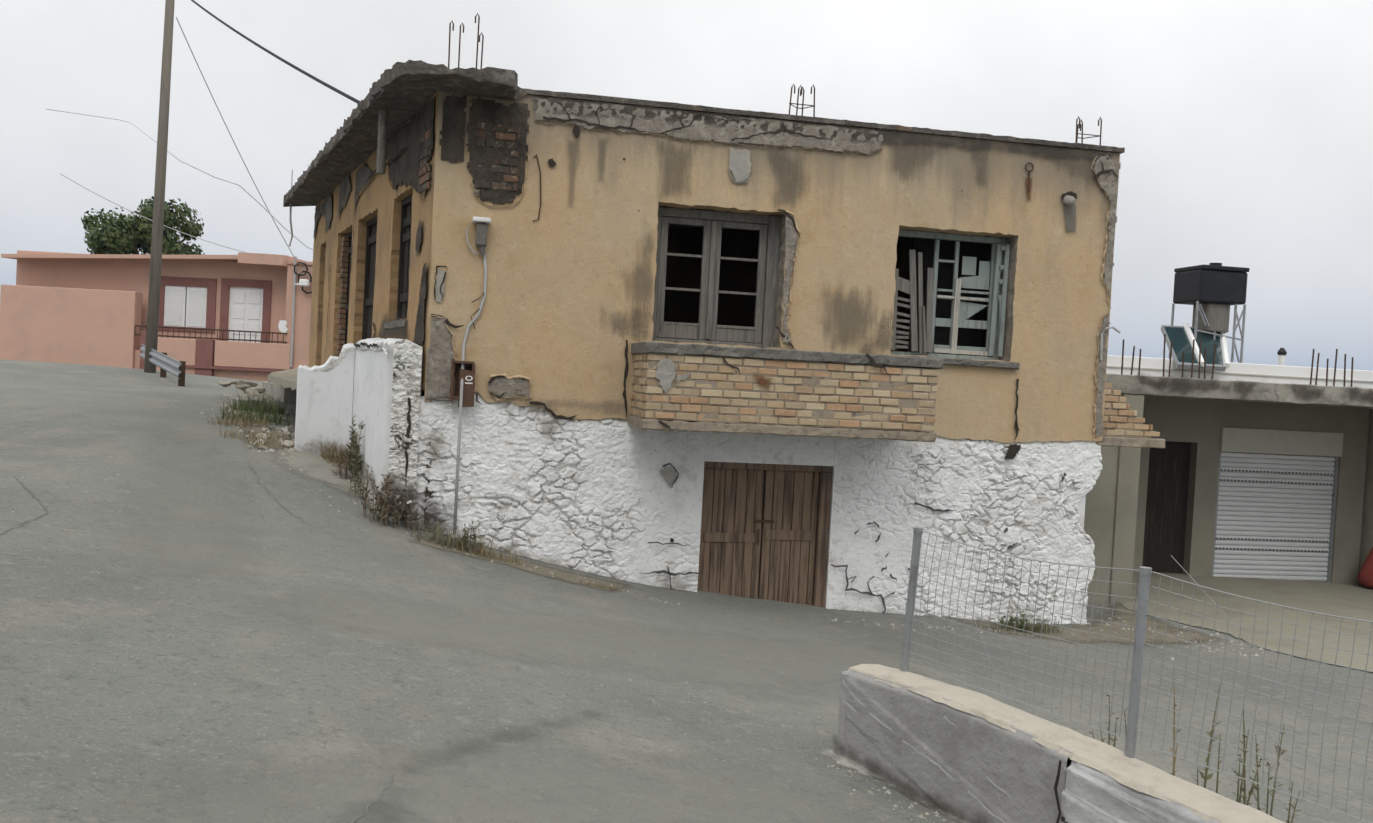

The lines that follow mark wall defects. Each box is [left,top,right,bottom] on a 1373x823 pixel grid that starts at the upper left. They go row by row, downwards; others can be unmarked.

peeling [313,97,435,239]
peeling [466,84,883,208]
flaking render [314,342,388,372]
peeling [413,219,457,398]
flaking render [488,373,532,401]
flaking render [782,210,801,345]
peeling [1075,116,1160,439]
crack [643,542,699,590]
crack [831,564,895,613]